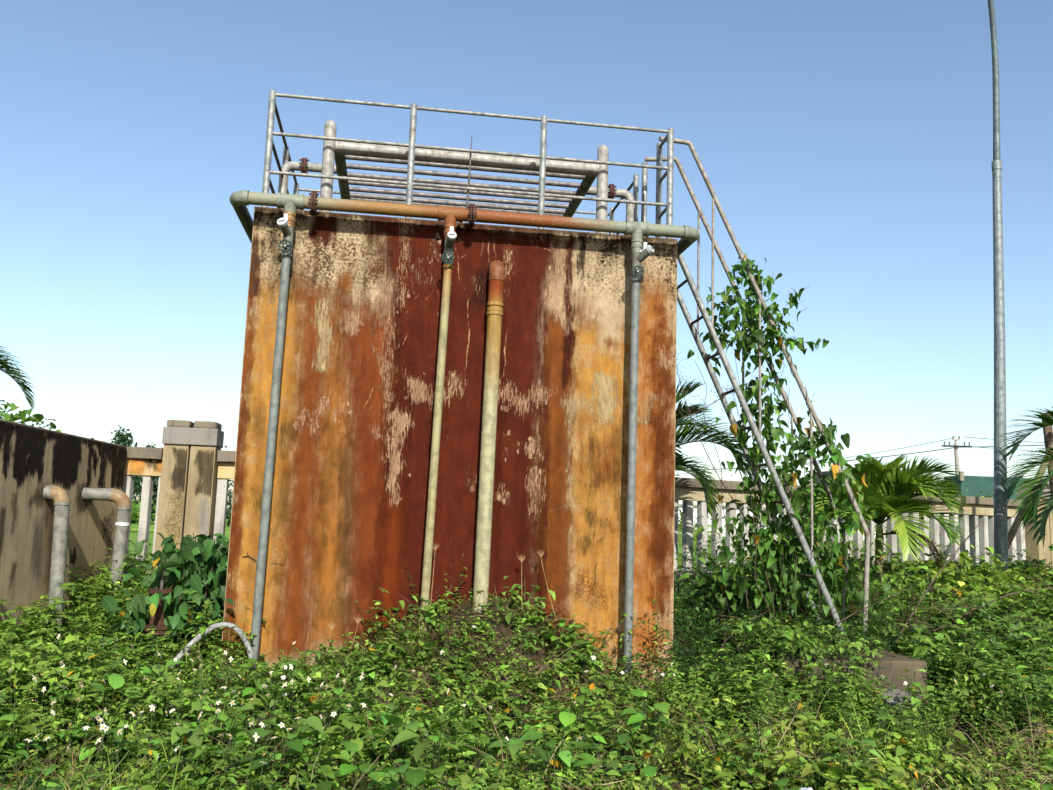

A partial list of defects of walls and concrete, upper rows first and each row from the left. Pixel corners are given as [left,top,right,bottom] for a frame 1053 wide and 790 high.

damp [0,421,127,512]
damp [166,447,214,544]
peeling [311,218,468,509]
rust [222,214,676,671]
peeling [505,434,546,516]
peeling [498,370,621,428]